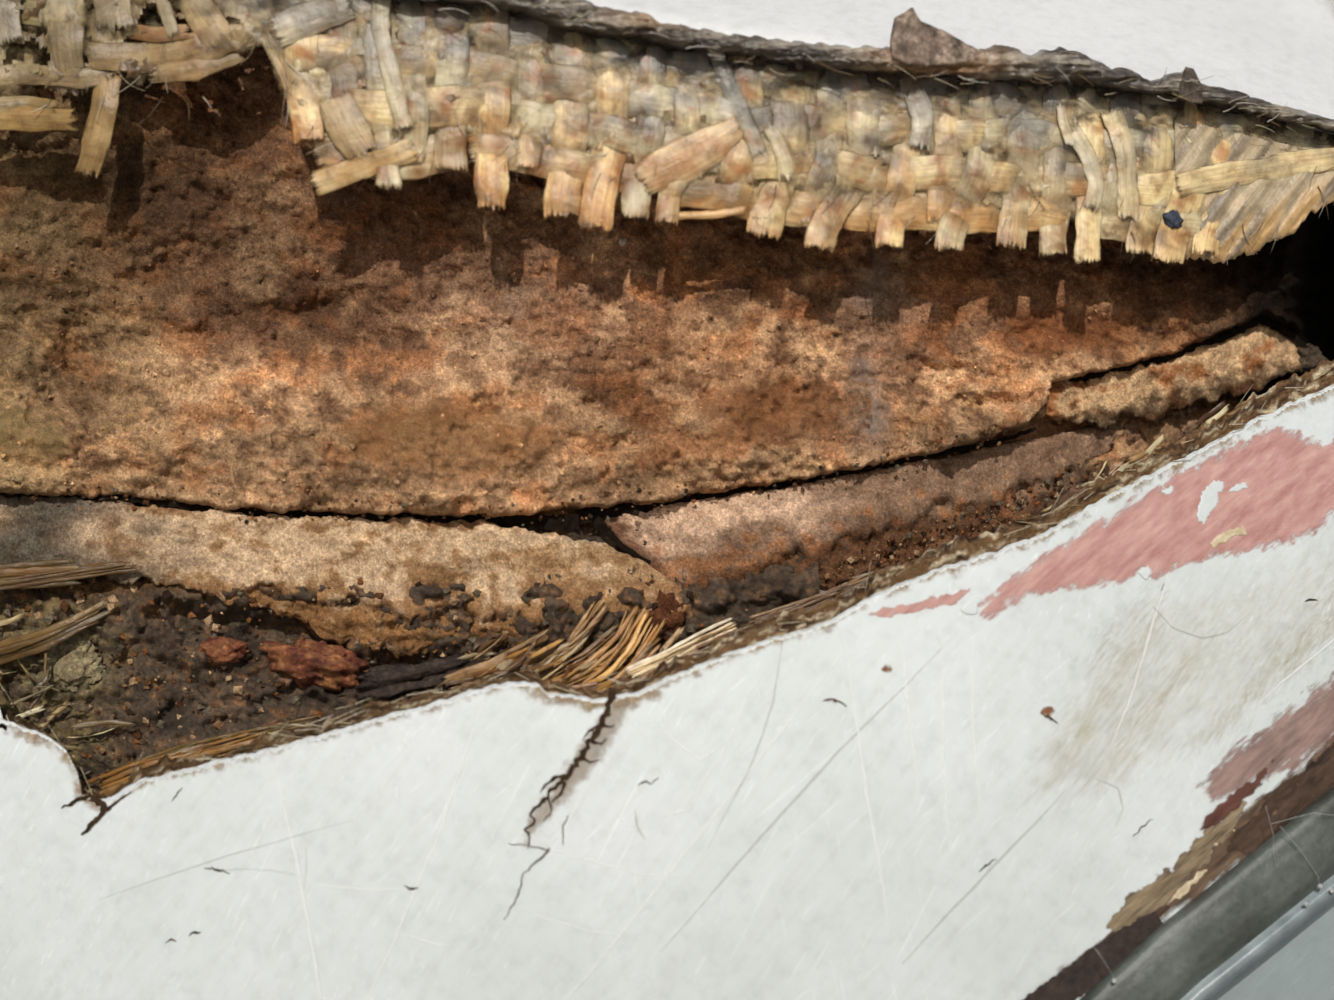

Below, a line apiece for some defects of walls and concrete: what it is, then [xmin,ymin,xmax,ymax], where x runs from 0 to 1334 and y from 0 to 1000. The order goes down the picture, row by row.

peeling [890,8,978,67]
peeling [1178,67,1203,104]
crack [1055,314,1312,383]
crack [4,427,1037,565]
peeling [869,427,1334,619]
peeling [1206,673,1334,801]
crack [504,687,618,919]